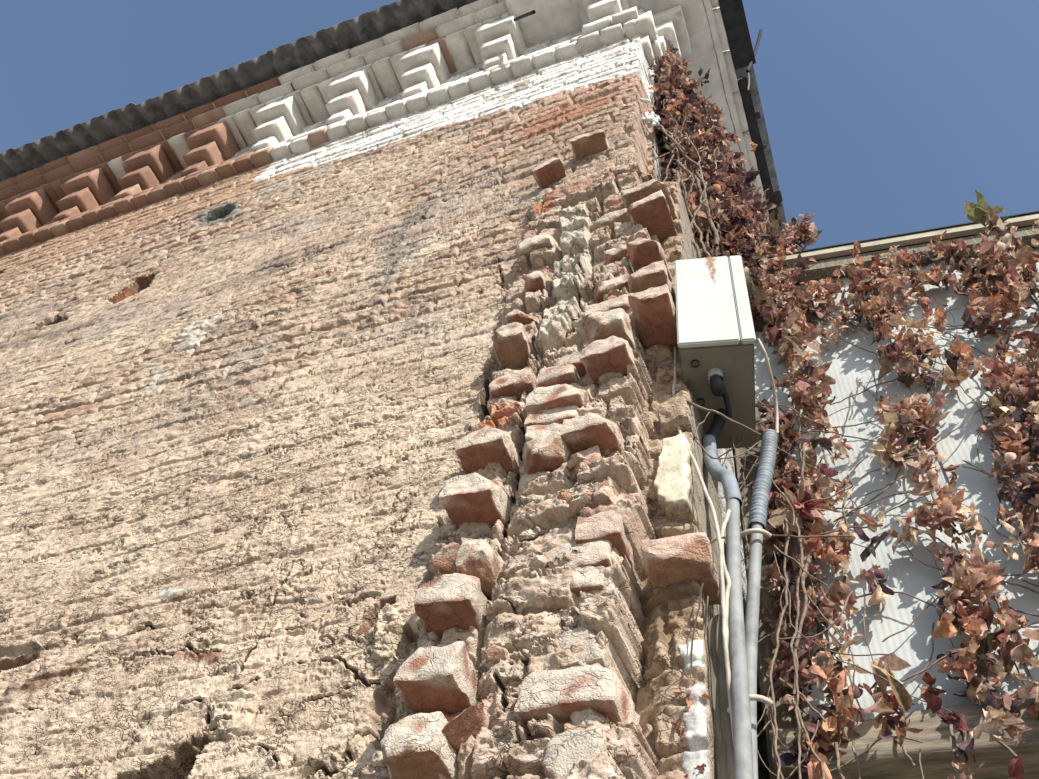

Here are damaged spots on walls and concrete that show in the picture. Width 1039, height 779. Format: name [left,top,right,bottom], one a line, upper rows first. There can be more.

flaking render [534,195,554,214]
spalling [772,189,783,207]
spalling [105,273,155,304]
flaking render [480,378,524,429]
spalling [0,653,40,671]
crack [120,624,303,691]
peeling [679,640,705,669]
crack [280,658,381,717]
spalling [367,622,418,750]
crack [181,699,228,732]
spalling [113,733,210,779]
crack [307,734,370,779]